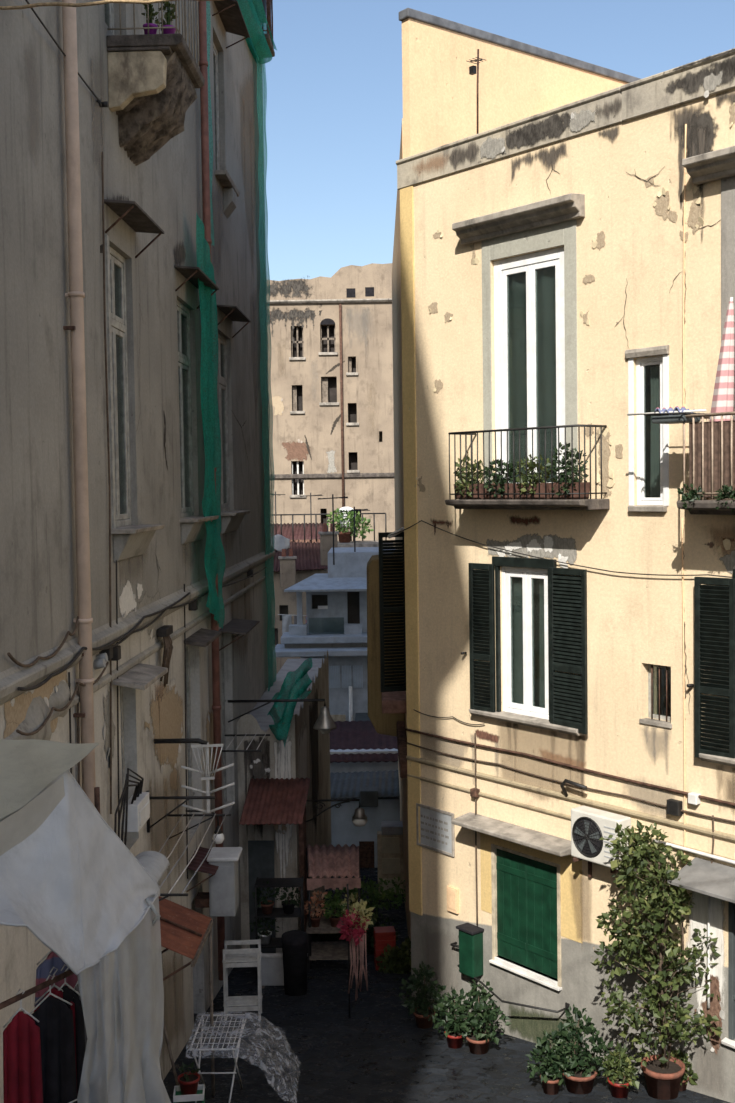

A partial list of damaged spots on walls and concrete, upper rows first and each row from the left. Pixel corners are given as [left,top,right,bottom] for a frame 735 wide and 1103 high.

peeling [703,71,723,98]
damp [450,142,478,168]
peeling [480,137,506,159]
damp [506,112,571,179]
peeling [570,109,596,132]
damp [596,99,622,142]
damp [666,49,735,206]
crack [628,166,720,229]
peeling [645,176,704,242]
peeling [282,439,310,461]
peeling [487,534,577,568]
peeling [144,678,184,791]